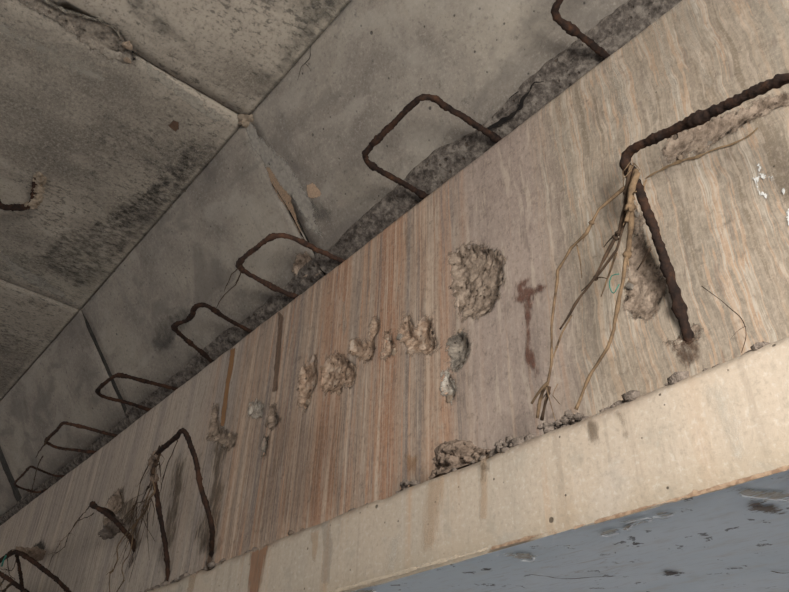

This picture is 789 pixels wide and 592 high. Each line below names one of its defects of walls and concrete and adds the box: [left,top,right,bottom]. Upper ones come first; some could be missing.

spalling [297,242,507,412]
rust [515,280,543,371]
spalling [0,549,72,592]
spalling [89,488,135,552]
spalling [152,482,170,581]
spalling [154,428,215,558]
rust [248,545,268,592]